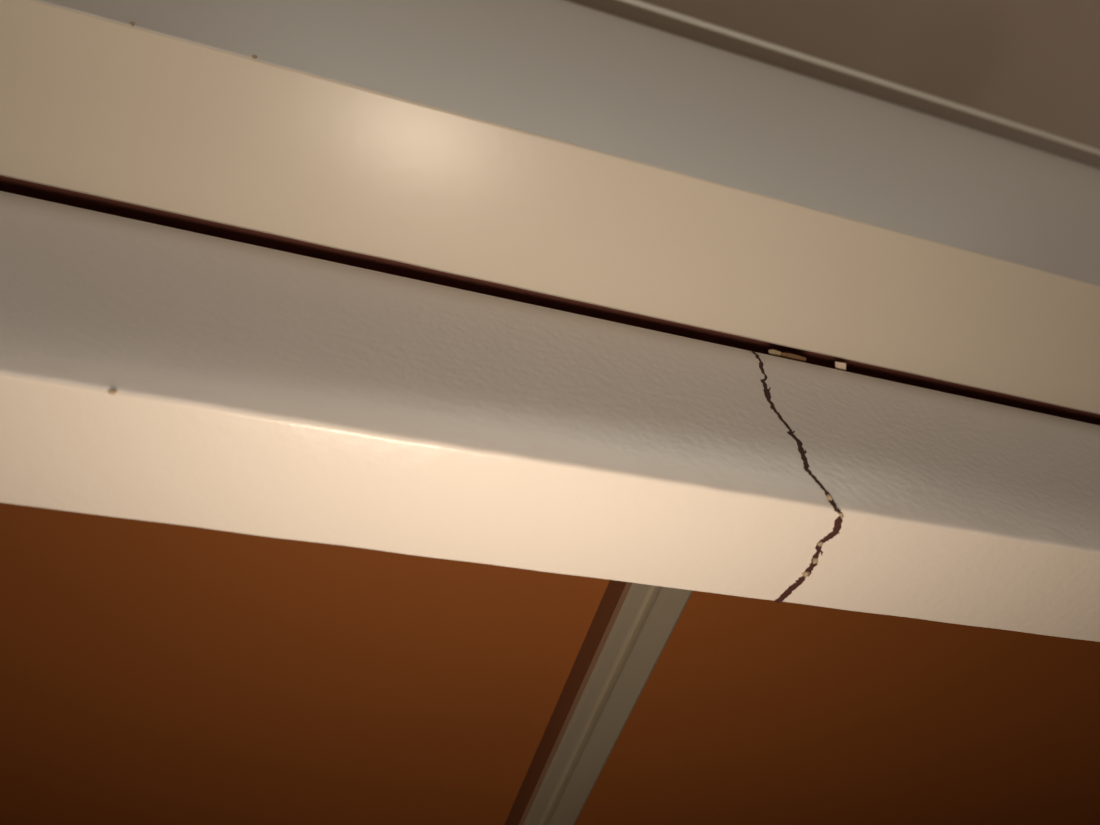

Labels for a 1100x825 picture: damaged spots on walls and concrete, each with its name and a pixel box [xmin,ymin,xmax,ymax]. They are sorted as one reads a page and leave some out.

crack [752,352,844,603]